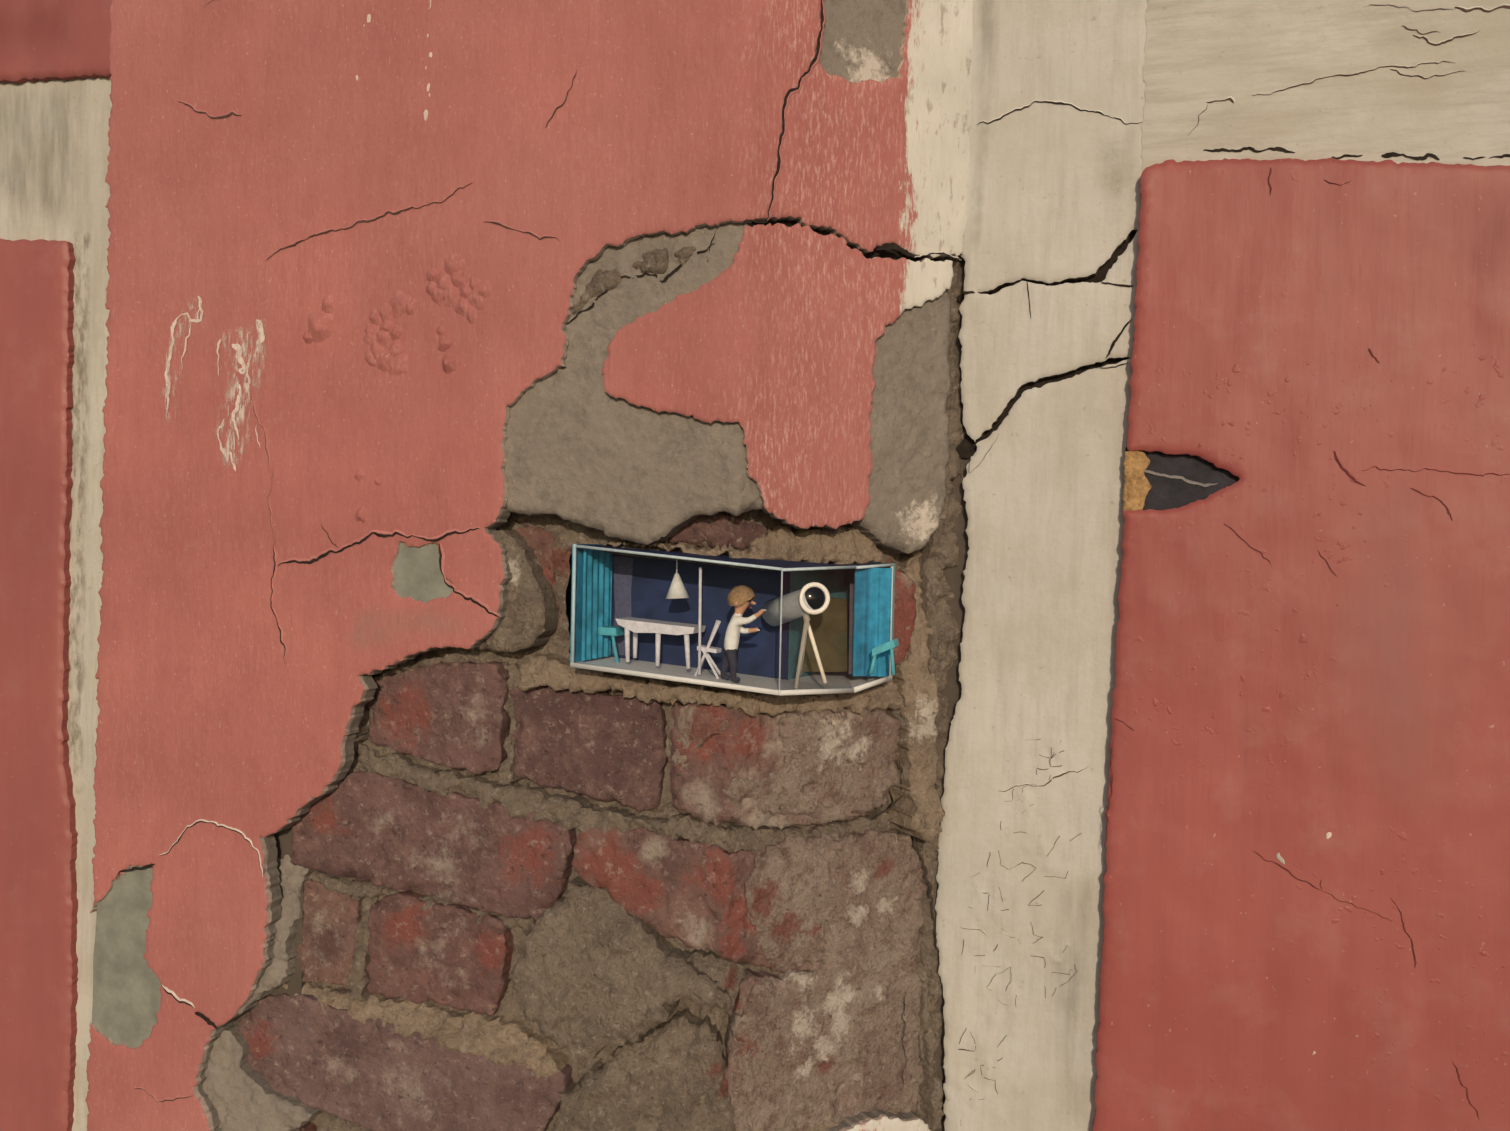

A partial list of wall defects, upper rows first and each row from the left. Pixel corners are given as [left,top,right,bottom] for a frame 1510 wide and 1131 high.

peeling [815,0,906,83]
crack [1189,4,1510,195]
crack [267,182,472,259]
crack [484,220,559,240]
crack [565,0,1141,473]
leakage [164,296,204,414]
leakage [217,320,265,471]
peeling [1123,446,1239,511]
spalling [203,222,967,1131]
peeling [92,865,161,1048]
crack [1254,851,1416,967]